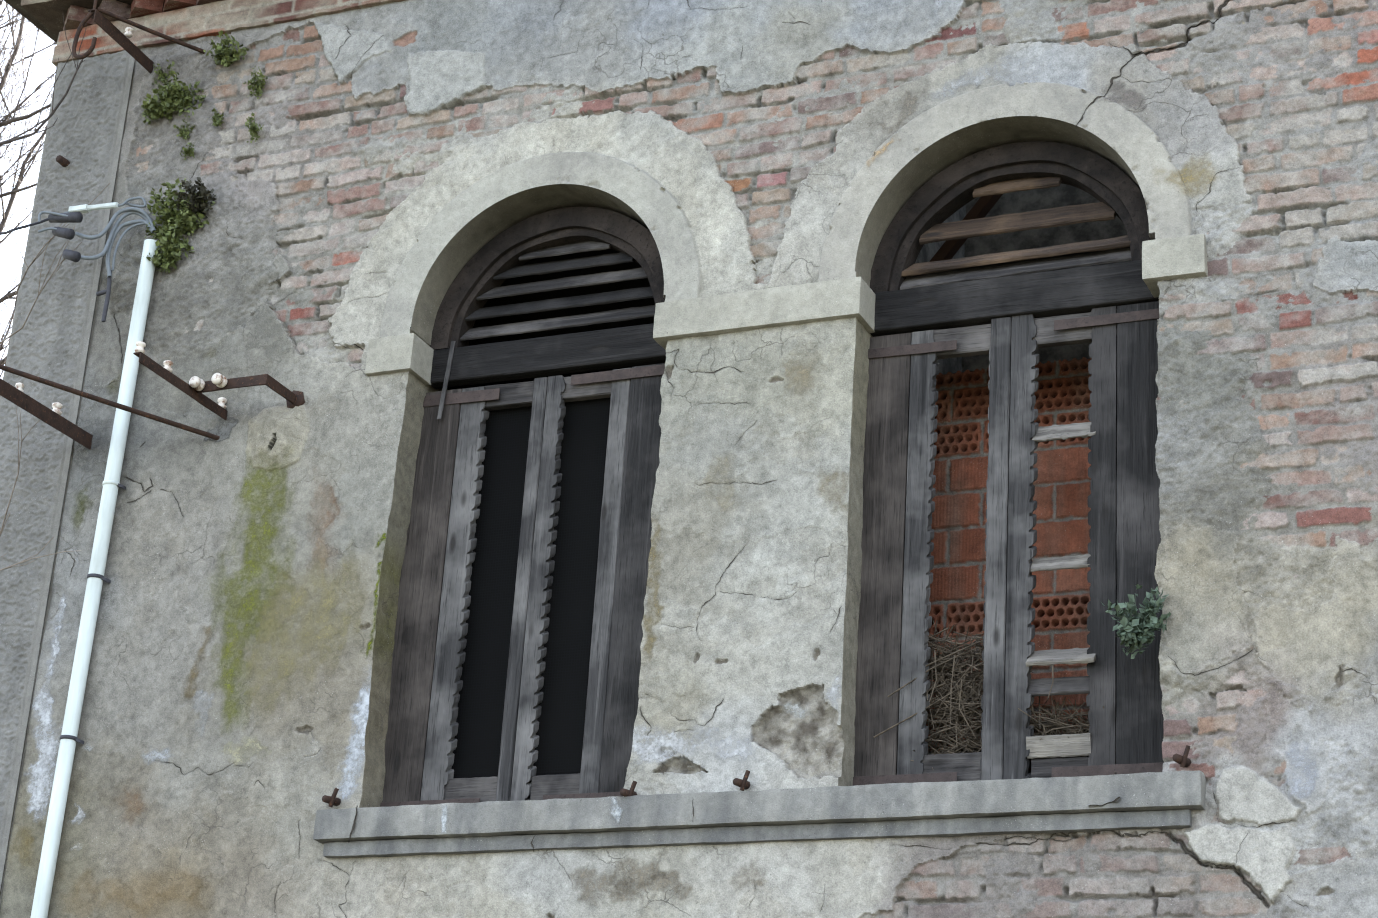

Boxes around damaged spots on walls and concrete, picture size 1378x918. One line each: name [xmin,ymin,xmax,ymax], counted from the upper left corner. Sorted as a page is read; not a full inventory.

crack [1076,0,1229,127]
flaking render [220,0,1378,542]
crack [664,349,755,445]
crack [665,545,795,641]
flaking render [654,751,708,774]
crack [640,694,724,736]
flaking render [752,683,844,779]
flaking render [861,684,1304,918]
flaking render [1335,662,1347,689]
flaking render [1315,885,1337,897]